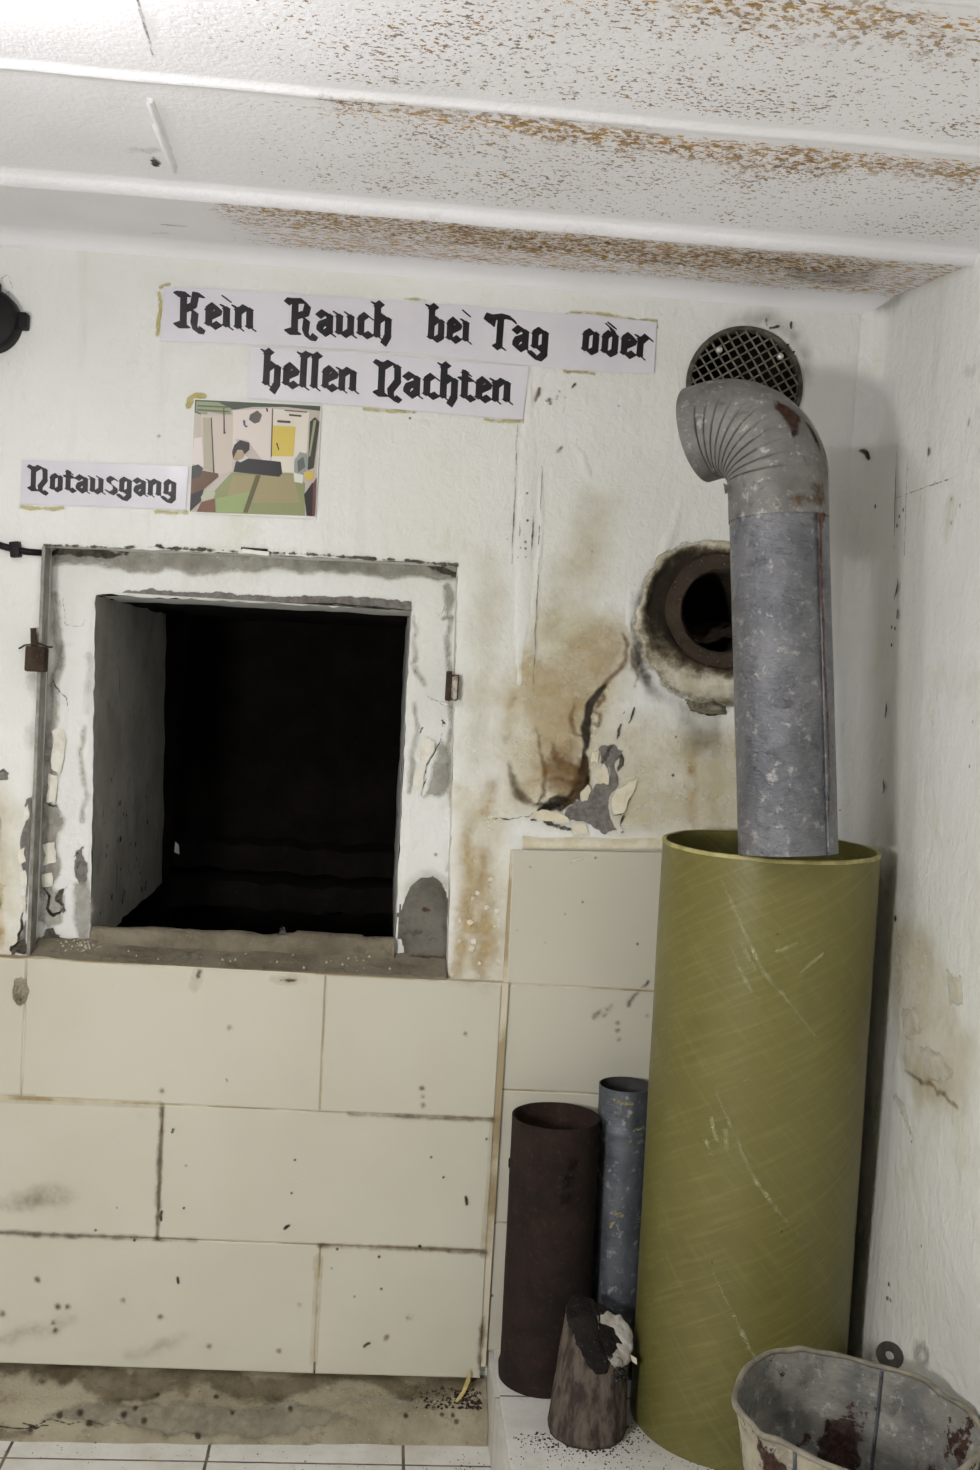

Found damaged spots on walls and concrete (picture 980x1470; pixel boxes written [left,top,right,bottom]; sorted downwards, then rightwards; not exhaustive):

corrosion [745,0,903,33]
corrosion [336,100,893,178]
corrosion [934,169,979,182]
corrosion [225,204,867,273]
spalling [9,593,92,955]
crack [484,684,635,821]
spalling [530,744,637,835]
damp [536,636,651,798]